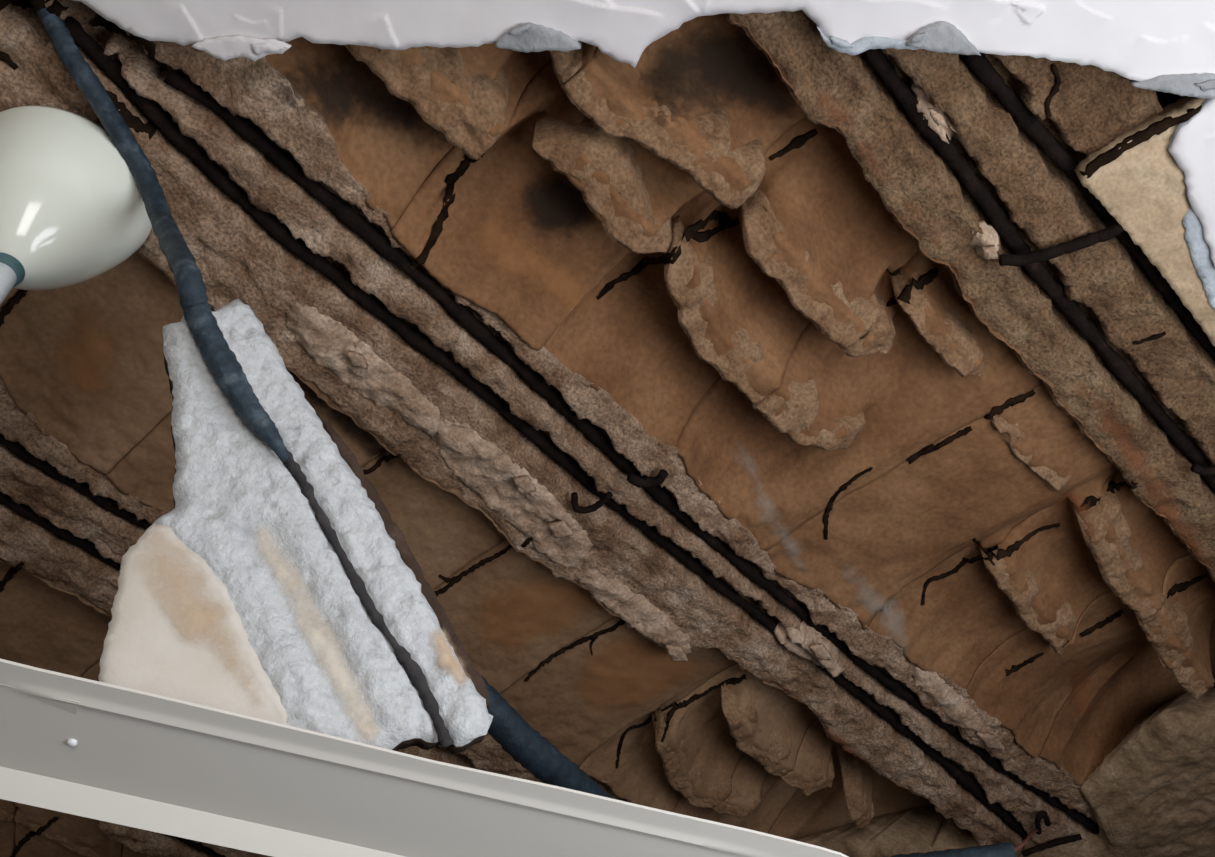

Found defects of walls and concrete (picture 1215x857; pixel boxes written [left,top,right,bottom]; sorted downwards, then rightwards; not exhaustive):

flaking render [191,35,292,61]
flaking render [495,22,581,53]
flaking render [816,21,981,55]
flaking render [1129,73,1215,100]
crack [409,153,485,271]
leakage [528,176,590,230]
crack [907,389,1036,465]
spalling [286,295,692,662]
crack [823,467,873,540]
crack [434,537,533,596]
crack [921,481,1138,605]
leakage [259,530,378,738]